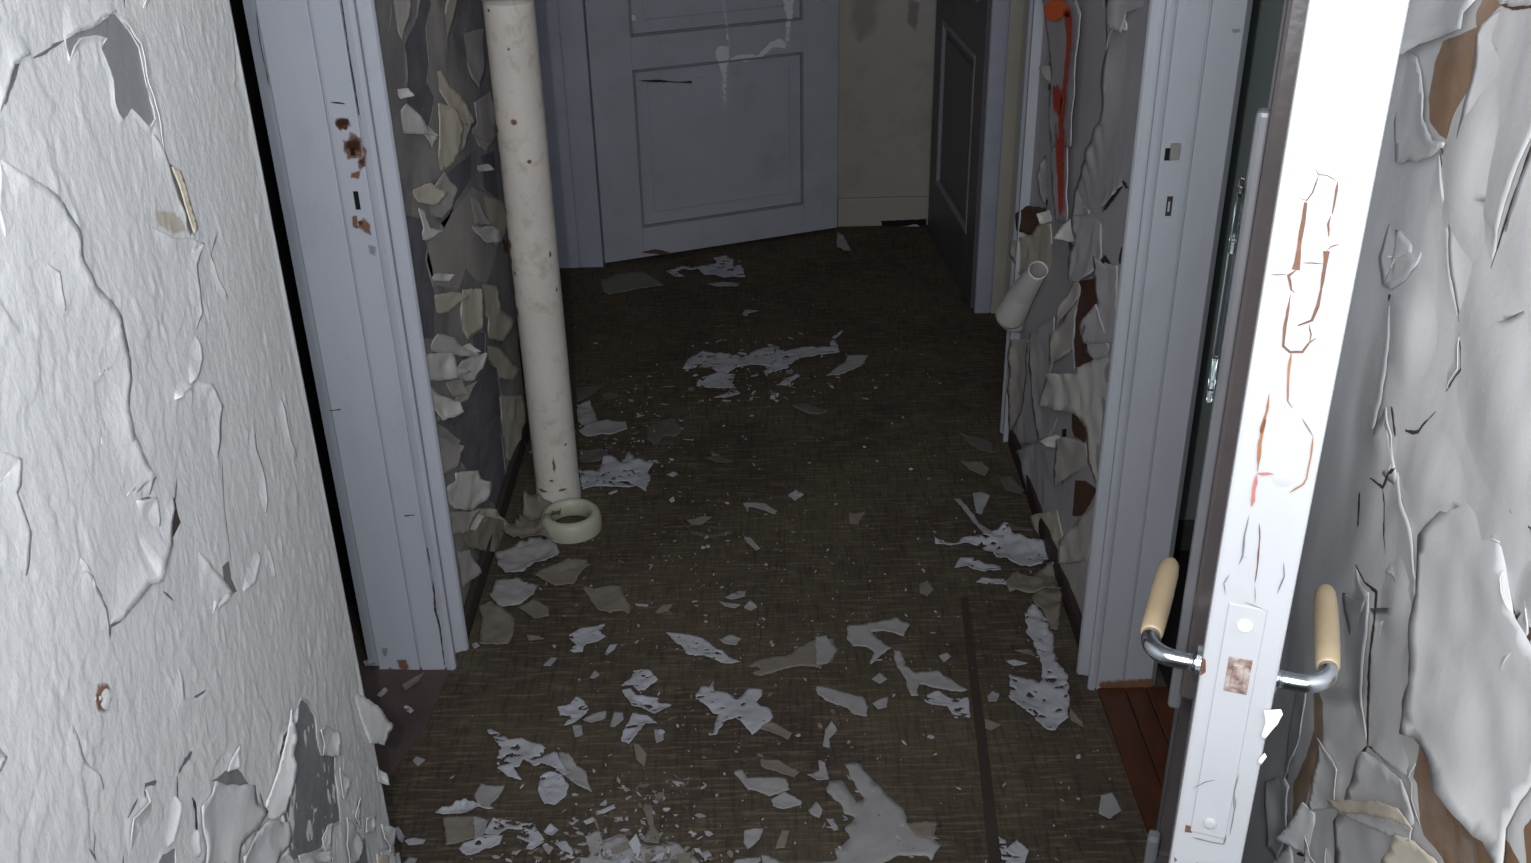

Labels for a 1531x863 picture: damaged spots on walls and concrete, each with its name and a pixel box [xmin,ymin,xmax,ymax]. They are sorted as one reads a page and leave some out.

peeling [0,0,276,637]
rust [336,118,366,178]
rust [352,216,371,235]
peeling [388,0,561,649]
peeling [934,0,1144,730]
peeling [1394,0,1531,322]
peeling [63,723,104,793]
rust [95,684,114,714]
peeling [122,697,426,863]
peeling [354,659,424,745]
peeling [435,669,671,856]
peeling [1258,504,1531,863]